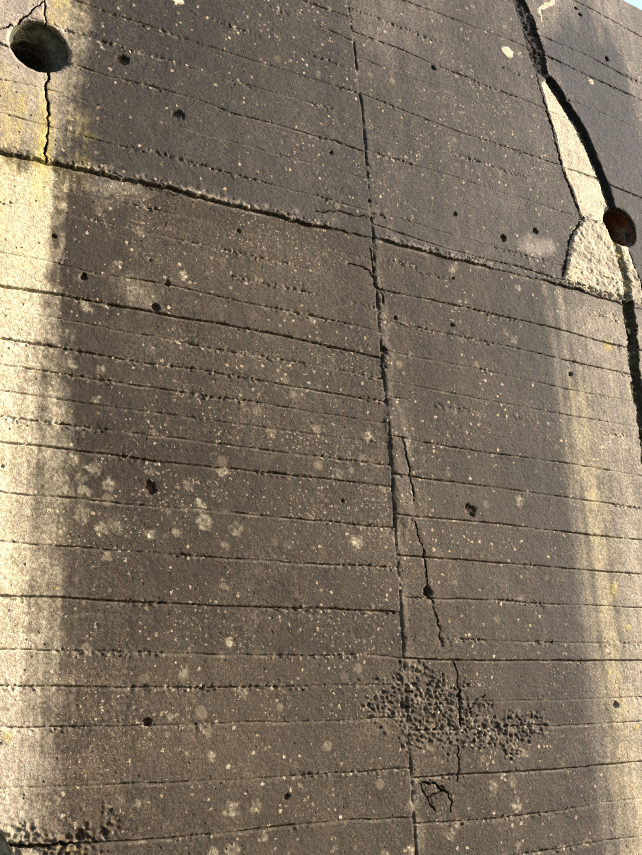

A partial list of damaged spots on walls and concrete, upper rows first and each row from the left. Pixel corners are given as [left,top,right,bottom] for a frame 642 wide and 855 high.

crack [0,0,47,47]
water stain [332,0,460,75]
crack [43,73,51,164]
crack [95,170,207,202]
crack [314,209,374,220]
crack [355,246,384,304]
spalling [541,80,608,222]
crack [513,0,642,468]
water stain [539,0,642,285]
water stain [513,230,642,855]
crack [400,437,462,782]
crack [9,840,76,849]